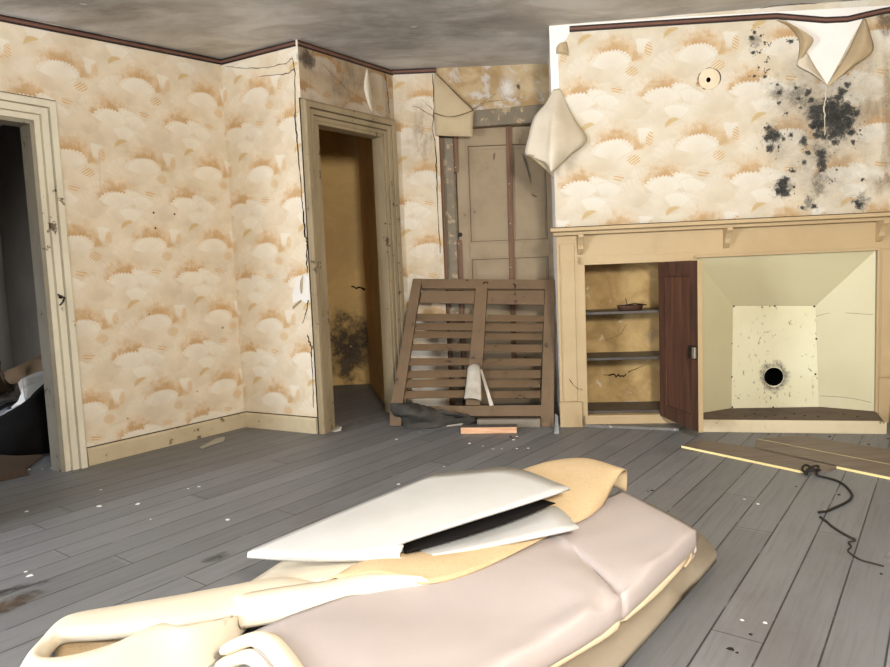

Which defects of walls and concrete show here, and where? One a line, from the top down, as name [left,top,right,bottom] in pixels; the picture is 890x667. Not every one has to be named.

crack [226,58,308,273]
peeling [549,5,890,93]
water stain [748,25,869,211]
crack [302,300,314,408]